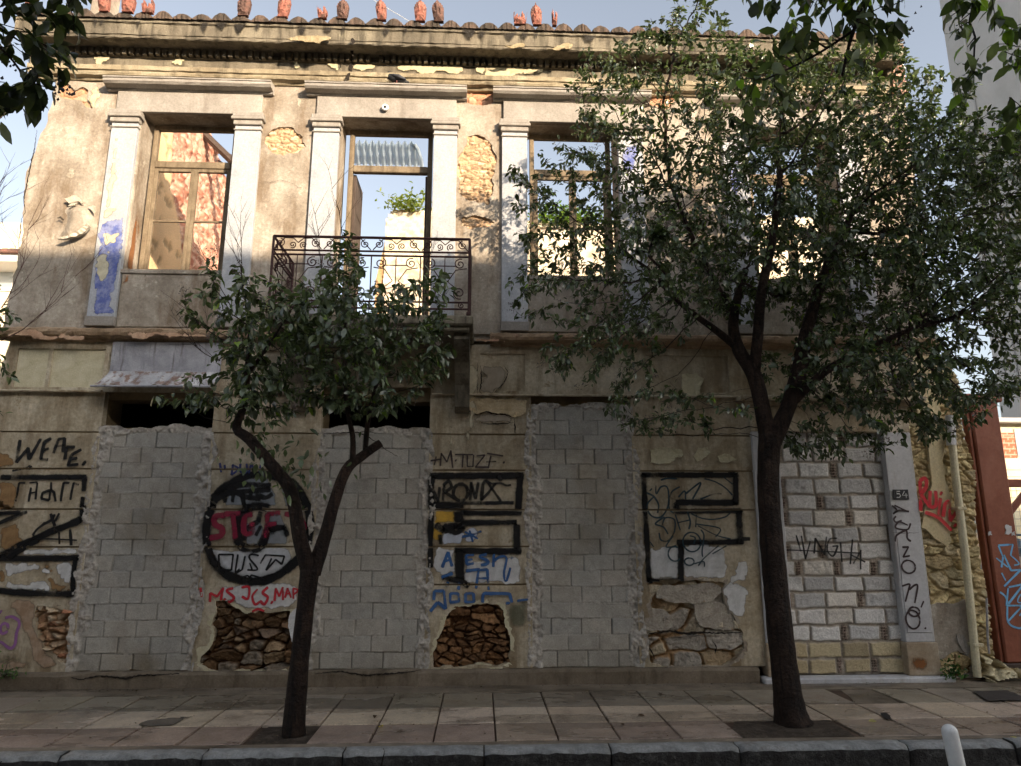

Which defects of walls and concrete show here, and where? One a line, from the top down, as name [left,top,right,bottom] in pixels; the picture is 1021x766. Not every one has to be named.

flaking render [59,84,101,108]
flaking render [265,128,306,156]
flaking render [457,136,497,205]
flaking render [462,216,493,229]
flaking render [8,329,84,340]
flaking render [469,397,527,423]
peeling [0,524,76,591]
peeling [650,545,748,616]
peeling [221,583,297,640]
flaking render [196,633,214,663]